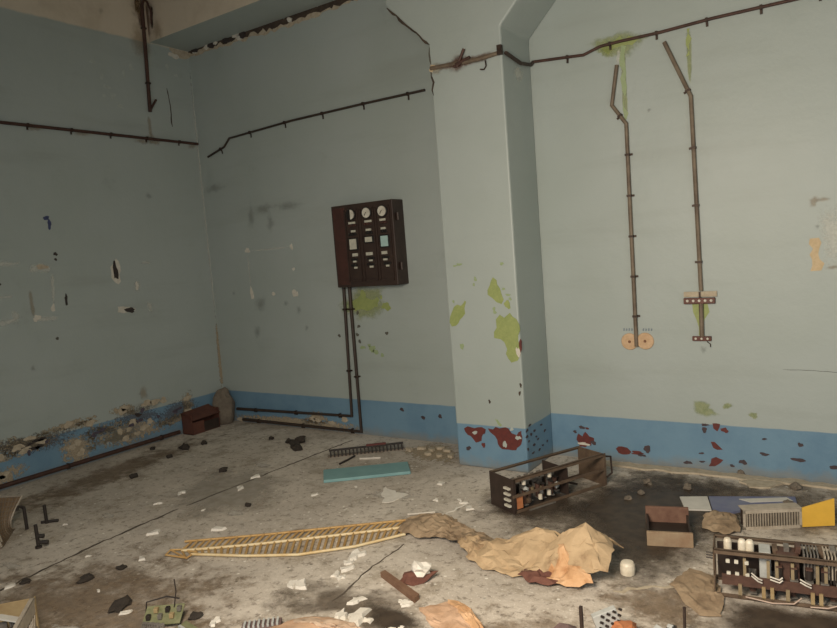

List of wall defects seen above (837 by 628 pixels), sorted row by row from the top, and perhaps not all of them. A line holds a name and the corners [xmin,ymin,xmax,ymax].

flaking render [168,0,358,59]
crack [387,8,435,96]
peeling [0,390,194,484]
peeling [464,419,548,454]
peeling [573,426,596,447]
peeling [702,423,729,433]
flaking render [606,442,837,530]